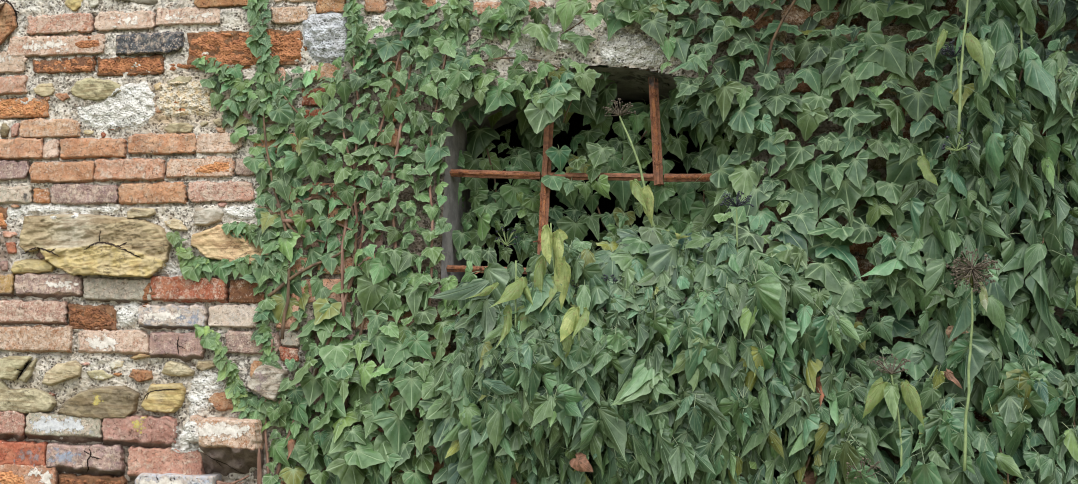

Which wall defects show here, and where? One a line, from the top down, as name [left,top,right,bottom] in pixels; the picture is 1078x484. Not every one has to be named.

rust [650,88,711,181]
rust [452,170,548,243]
crack [22,231,140,258]